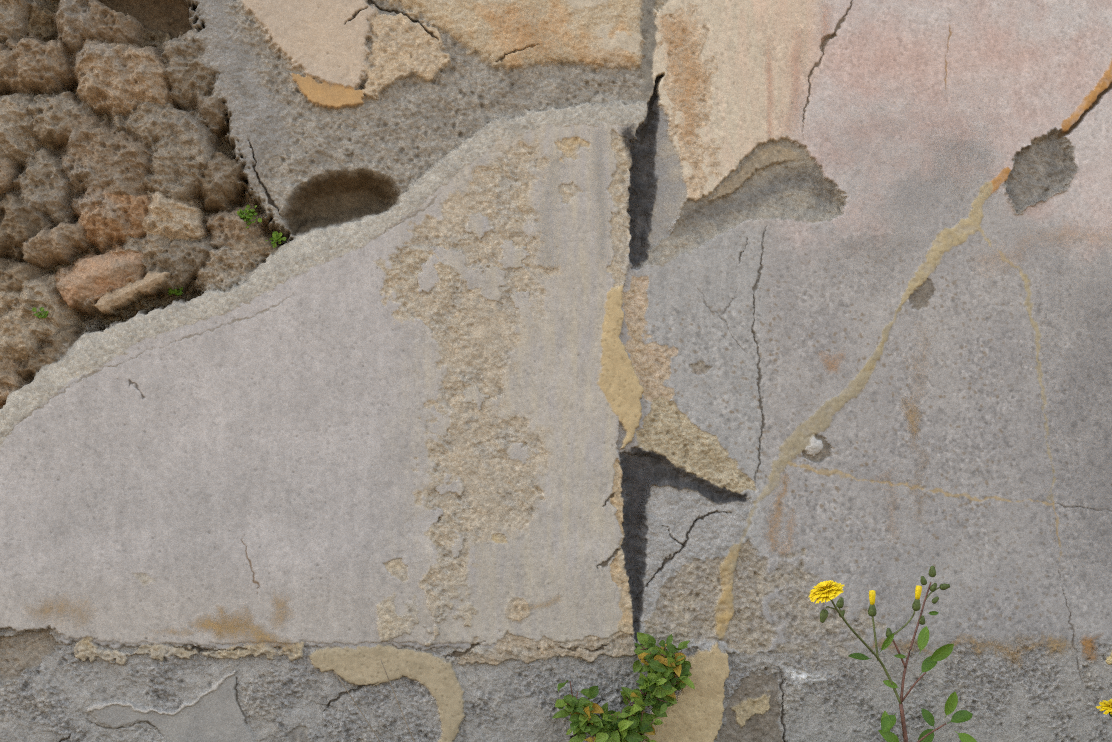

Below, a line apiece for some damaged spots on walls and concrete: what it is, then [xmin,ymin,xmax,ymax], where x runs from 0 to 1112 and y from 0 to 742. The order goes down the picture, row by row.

crack [803,0,853,127]
crack [944,27,952,88]
crack [1058,61,1112,139]
crack [627,74,665,269]
flaking render [373,130,887,671]
crack [558,168,1112,686]
flaking render [74,637,305,665]
crack [173,645,248,653]
crack [445,641,485,658]
spalling [594,692,623,720]
flaking render [732,690,771,728]